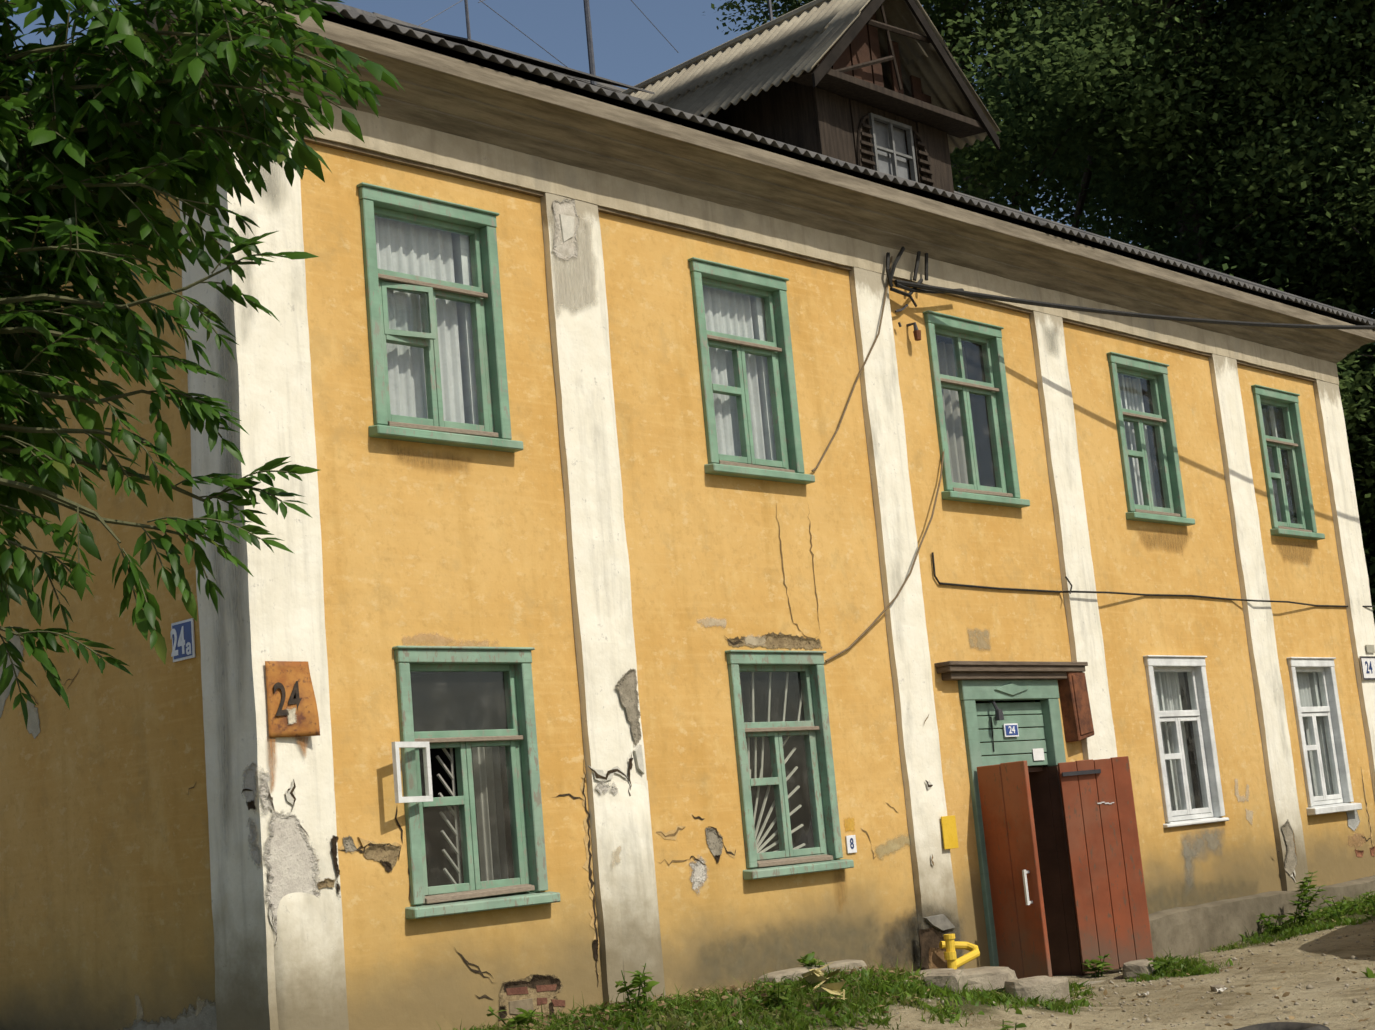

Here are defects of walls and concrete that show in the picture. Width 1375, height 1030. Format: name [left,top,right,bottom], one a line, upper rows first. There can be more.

crack [776,503,820,638]
spalling [698,618,822,650]
peeling [0,631,24,718]
spalling [615,669,644,774]
peeling [241,763,401,933]
crack [556,754,632,983]
crack [656,815,704,865]
spalling [690,826,724,893]
crack [724,845,736,858]
peeling [1281,819,1297,875]
crack [455,949,493,1000]
spalling [499,974,565,1021]